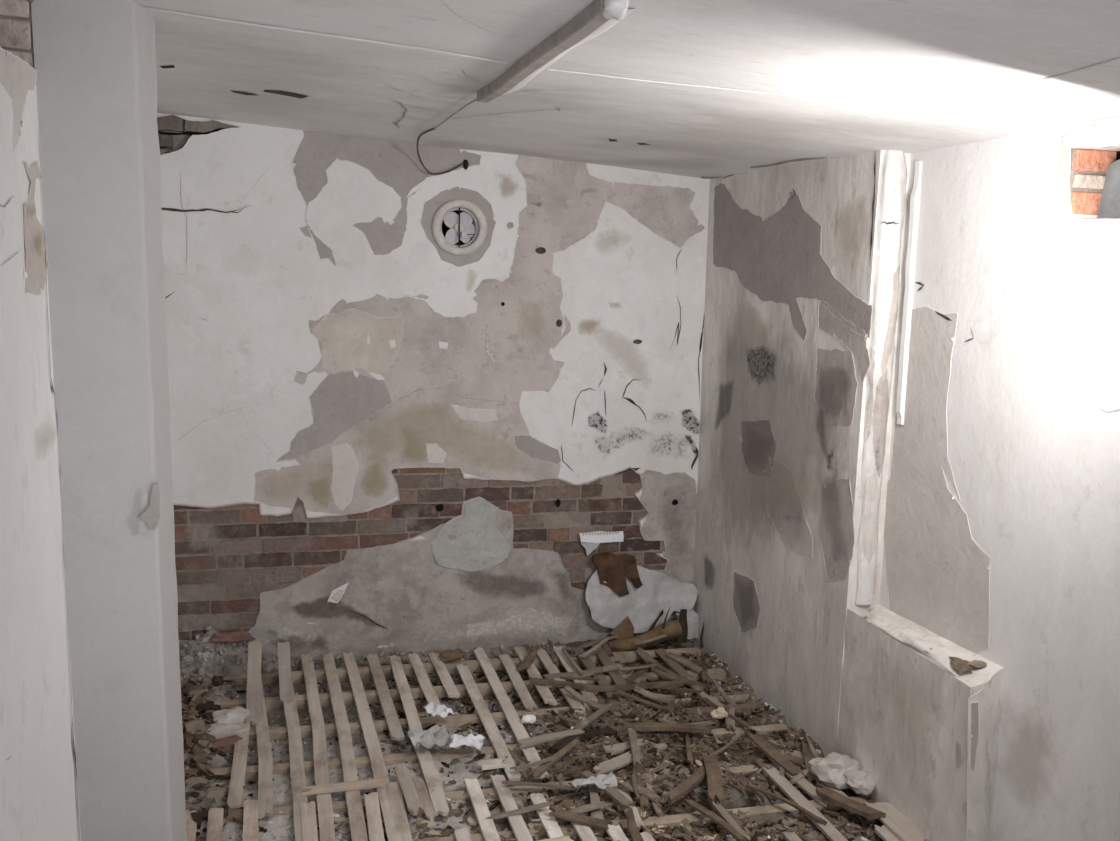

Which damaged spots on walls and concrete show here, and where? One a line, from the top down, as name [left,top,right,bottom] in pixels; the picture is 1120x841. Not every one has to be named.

flaking render [0,0,50,296]
crack [158,127,234,149]
flaking render [157,114,243,157]
crack [161,174,264,299]
peeling [291,130,497,268]
flaking render [1056,123,1120,234]
crack [671,294,705,403]
peeling [138,155,873,659]
crack [561,363,647,470]
damp [661,409,699,453]
crack [690,447,698,470]
crack [47,519,80,837]